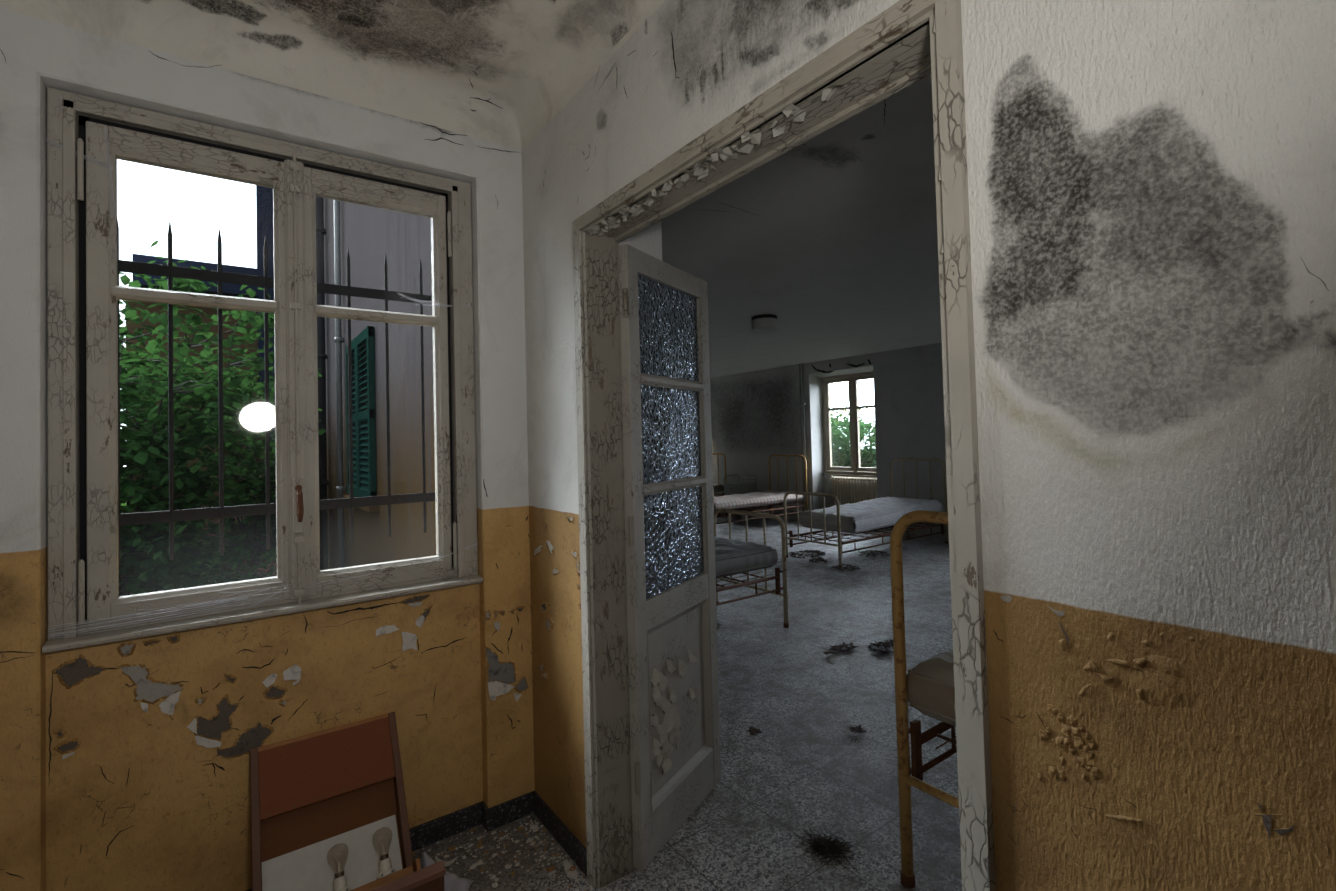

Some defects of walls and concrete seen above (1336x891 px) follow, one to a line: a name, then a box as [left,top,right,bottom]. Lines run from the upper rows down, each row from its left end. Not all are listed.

damp [182,0,499,64]
mould [993,92,1090,313]
peeling [376,594,432,652]
peeling [51,634,274,760]
peeling [262,664,301,707]
peeling [485,646,549,702]
peeling [650,648,697,775]